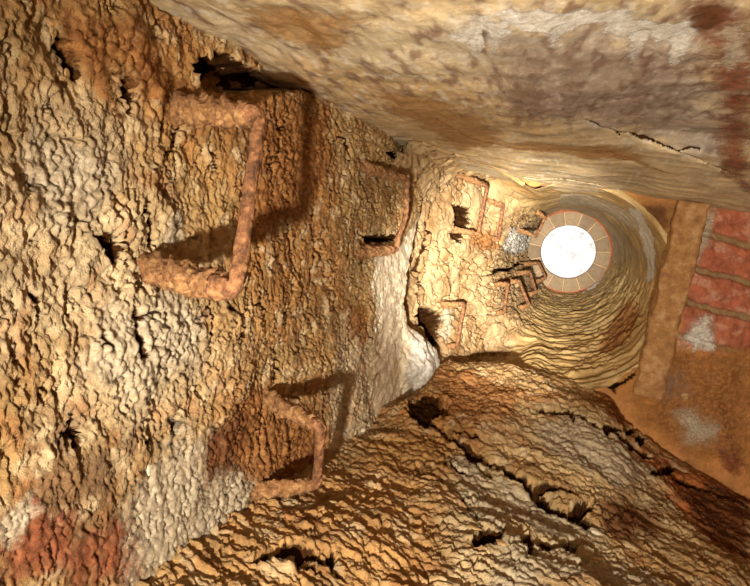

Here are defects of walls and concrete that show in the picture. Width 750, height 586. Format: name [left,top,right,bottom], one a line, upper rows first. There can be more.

leakage [718,26,745,69]
corrosion [254,94,330,236]
crack [586,119,726,170]
corrosion [470,231,500,249]
efflorescence [681,315,716,352]
corrosion [203,391,315,495]
crack [536,409,724,498]
efflorescence [0,496,37,548]